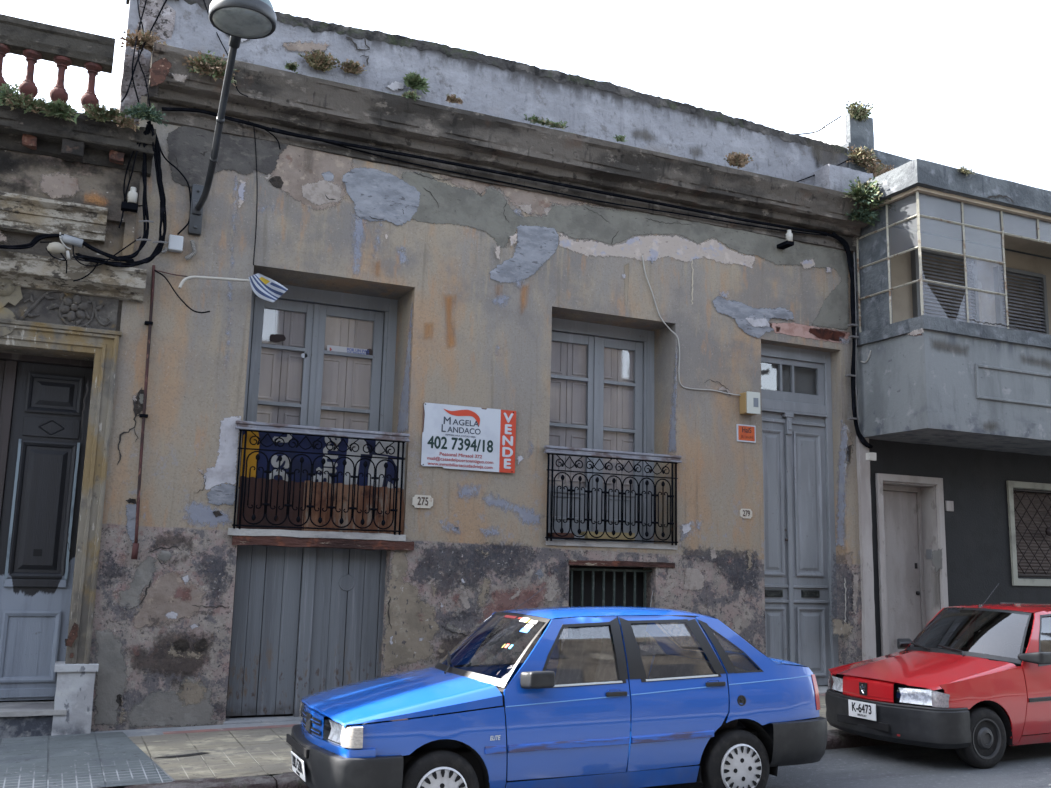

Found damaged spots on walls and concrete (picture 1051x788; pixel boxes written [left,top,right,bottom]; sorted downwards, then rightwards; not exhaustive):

flaking render [265,145,353,211]
peeling [494,233,518,259]
peeling [559,233,755,268]
peeling [746,318,770,327]
flaking render [183,416,241,527]
spalling [126,498,137,543]
flaking render [102,532,232,659]